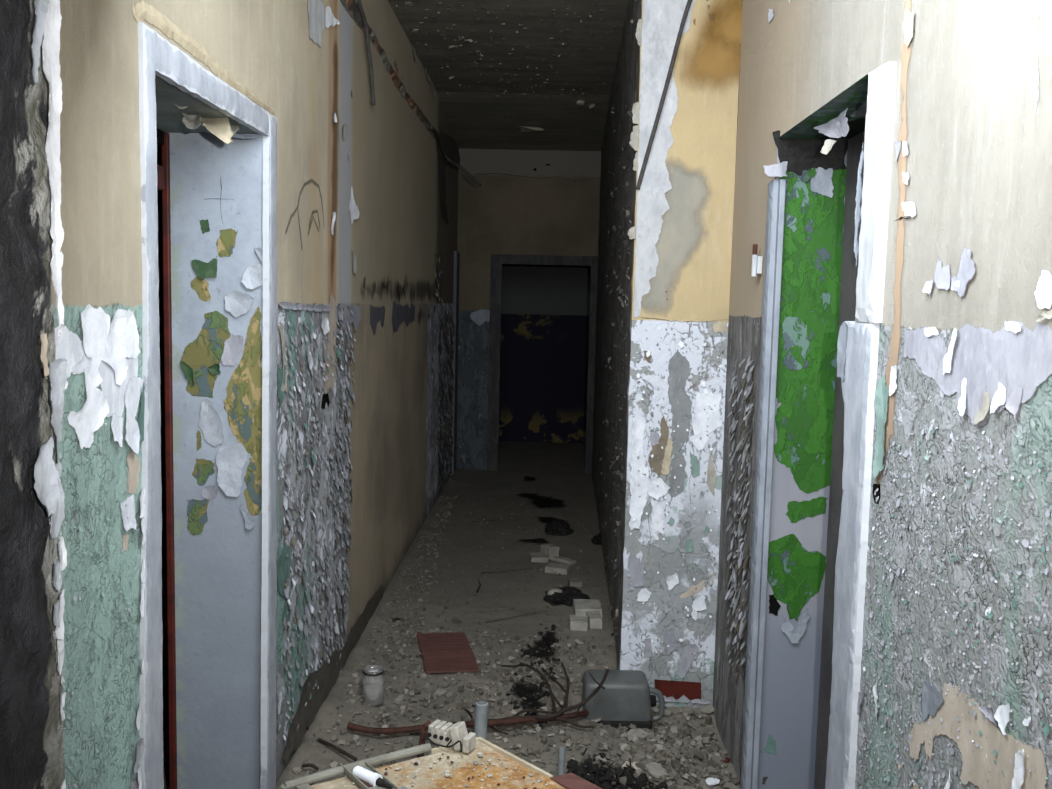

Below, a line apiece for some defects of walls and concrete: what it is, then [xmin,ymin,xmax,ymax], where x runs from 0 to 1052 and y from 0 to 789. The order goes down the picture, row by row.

damp [689,0,743,83]
peeling [902,8,915,47]
peeling [894,141,909,185]
peeling [894,201,916,221]
peeling [923,247,975,298]